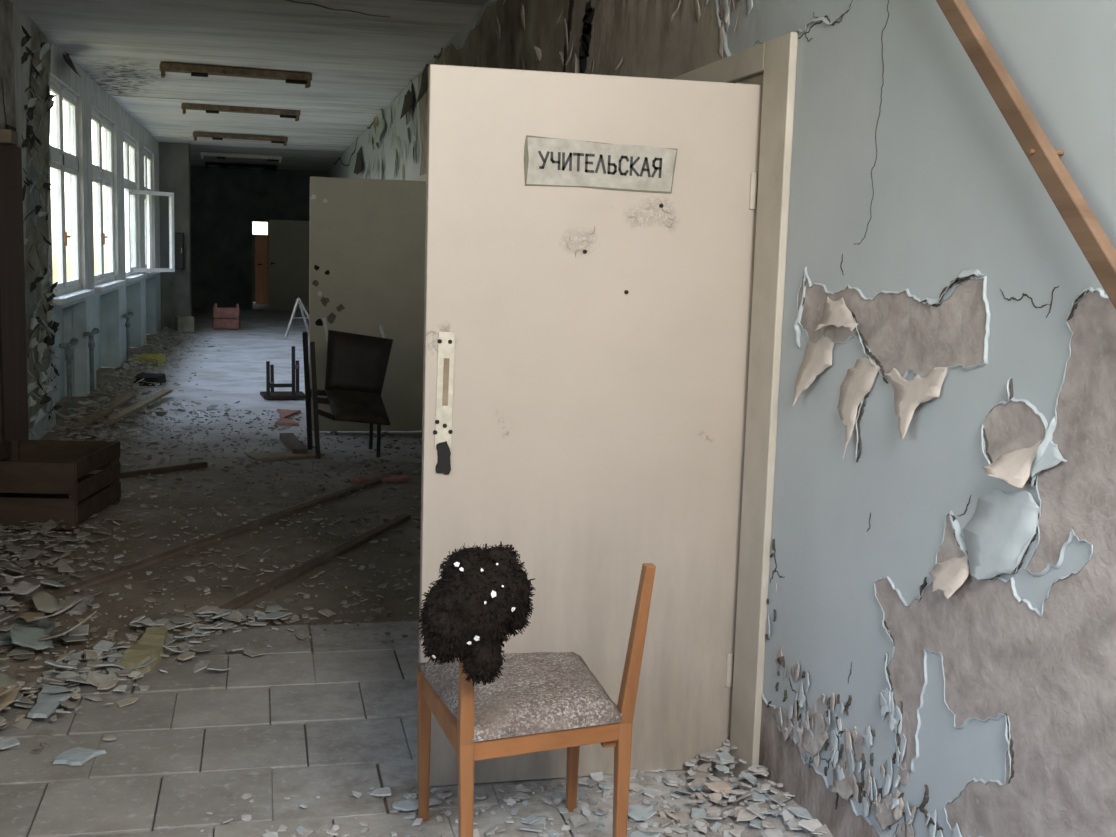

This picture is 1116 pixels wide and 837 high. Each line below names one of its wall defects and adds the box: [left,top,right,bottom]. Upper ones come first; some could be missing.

peeling [21,18,81,439]
flaking render [353,0,753,180]
crack [796,0,855,42]
crack [840,0,889,273]
peeling [758,266,1116,837]